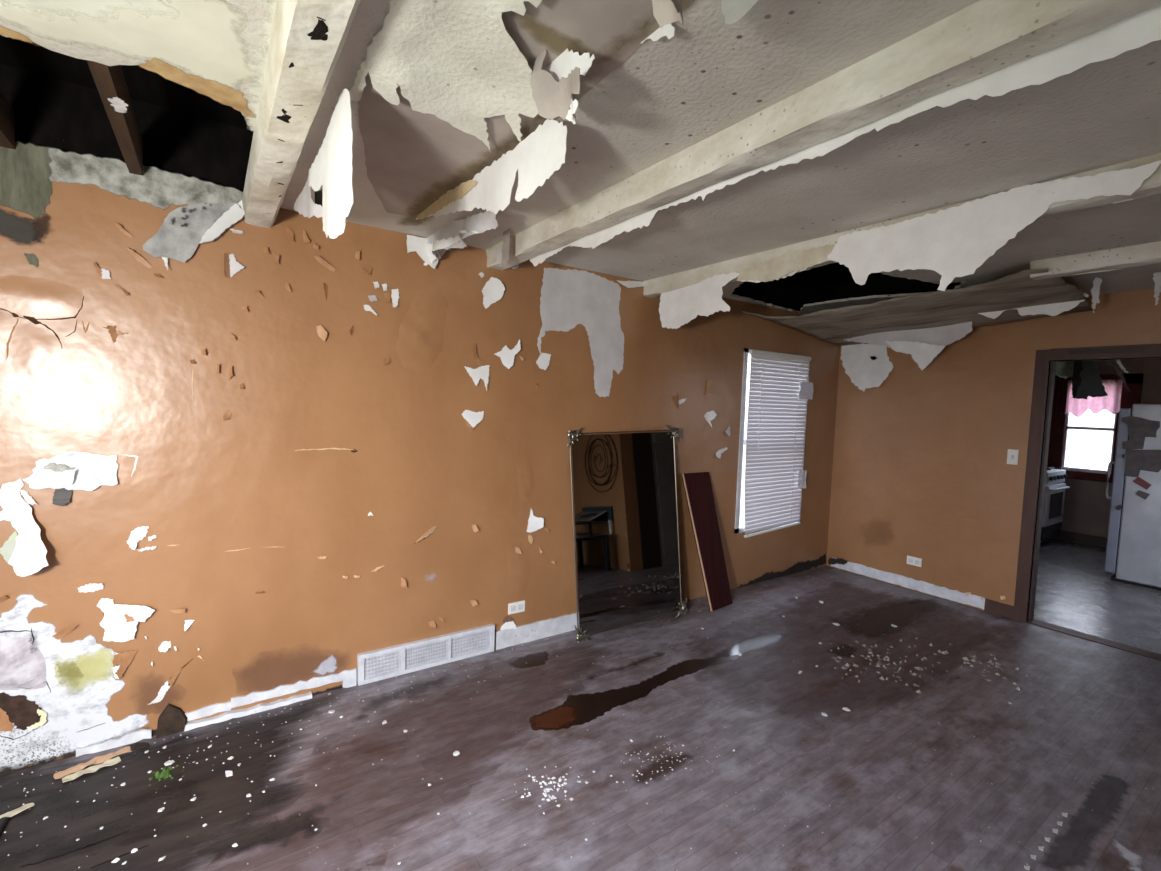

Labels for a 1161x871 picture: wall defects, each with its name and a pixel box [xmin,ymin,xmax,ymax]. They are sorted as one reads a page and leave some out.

peeling [107,97,128,113]
peeling [0,0,257,88]
flaking render [0,141,245,278]
peeling [294,0,1161,397]
crack [0,296,89,359]
peeling [0,451,138,577]
leakage [0,594,343,871]